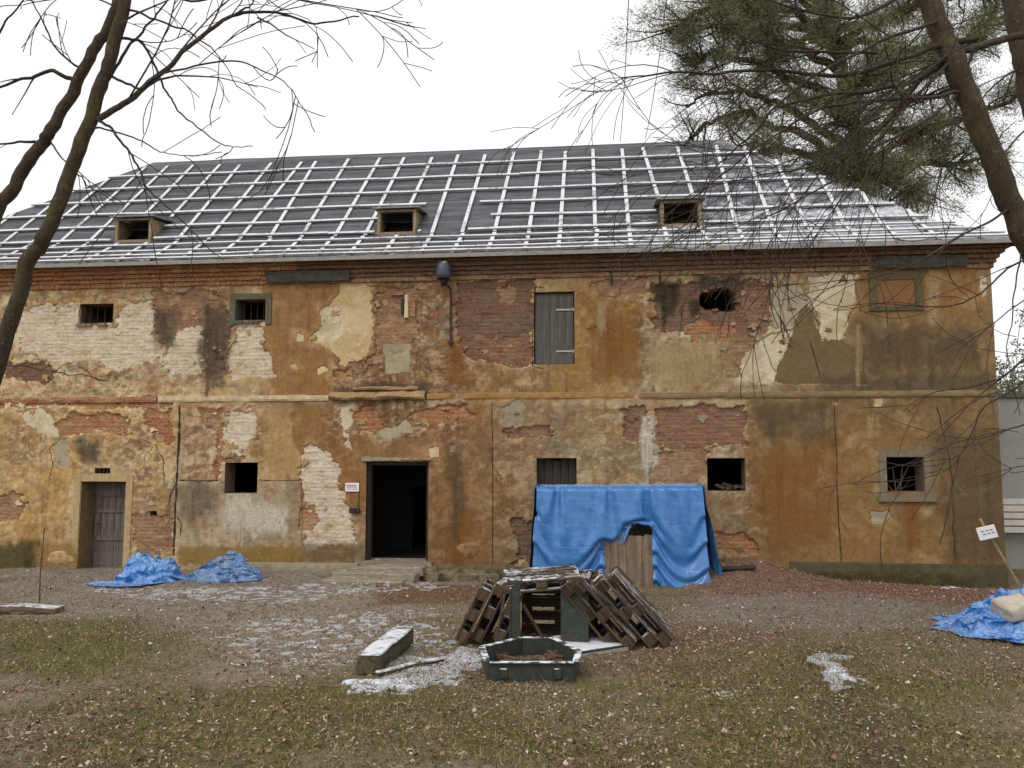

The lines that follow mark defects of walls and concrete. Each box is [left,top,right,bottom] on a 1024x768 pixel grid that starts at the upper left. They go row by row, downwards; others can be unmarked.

spalling [4,287,277,385]
damp [154,310,174,345]
damp [198,306,229,393]
peeling [296,283,421,381]
spalling [473,330,532,365]
spalling [496,284,516,305]
spalling [590,272,860,385]
spalling [199,406,257,480]
peeling [500,400,554,439]
spalling [620,403,749,484]
spalling [298,443,357,550]
spalling [511,518,532,566]